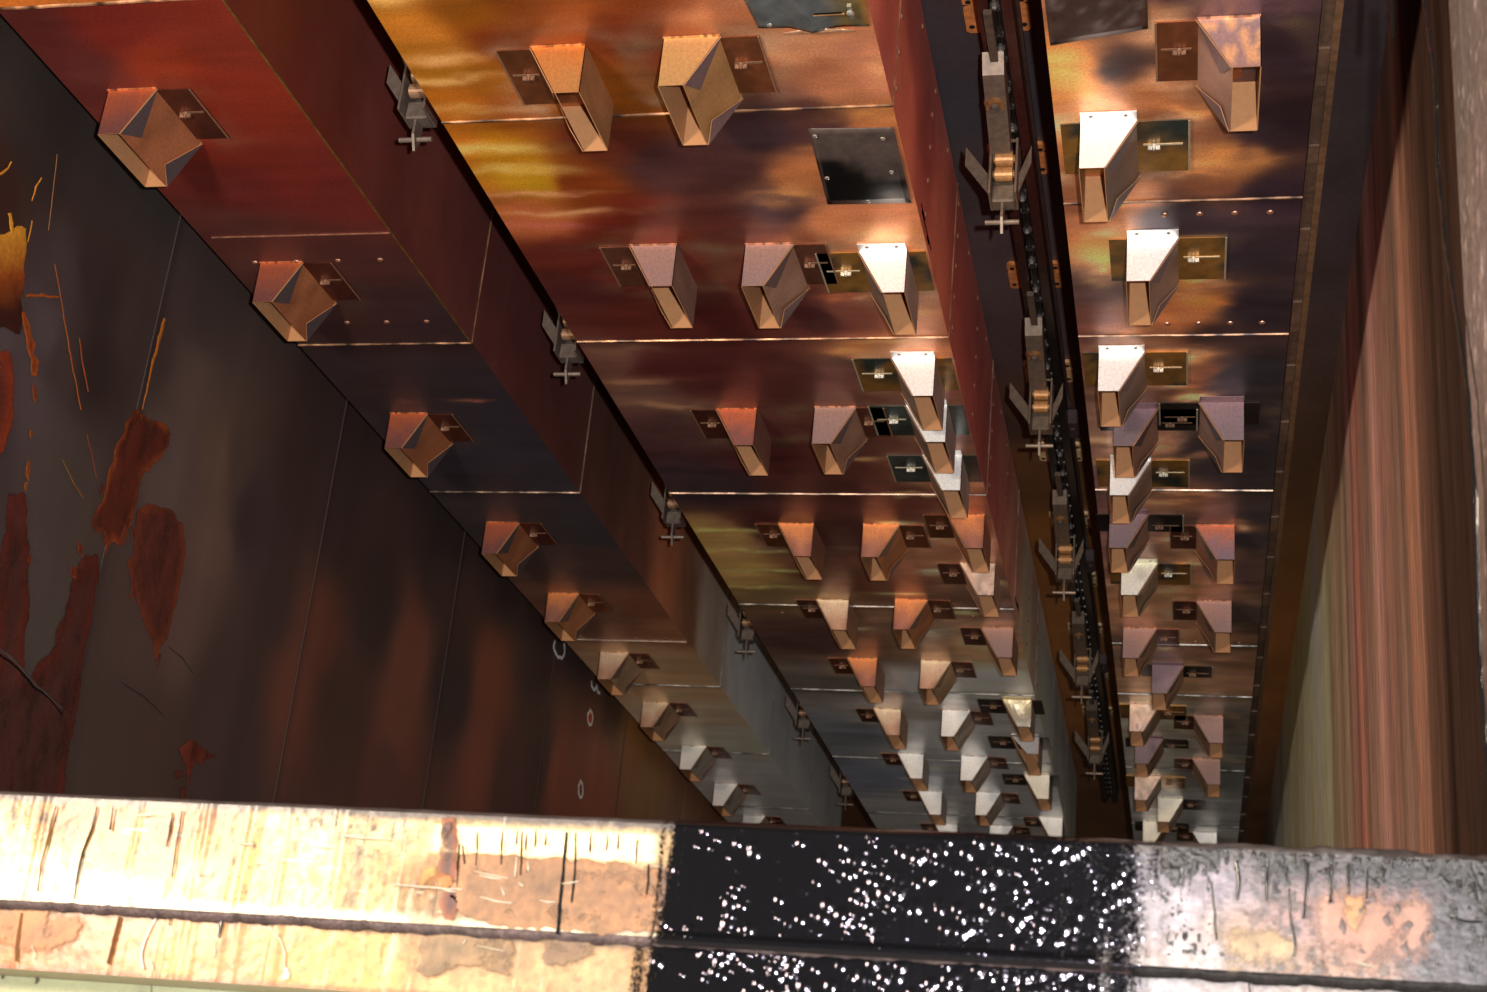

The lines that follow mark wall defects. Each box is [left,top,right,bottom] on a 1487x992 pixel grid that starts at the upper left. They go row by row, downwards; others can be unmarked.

rust [0,318,186,794]
crack [0,649,63,715]
rust [418,817,465,920]